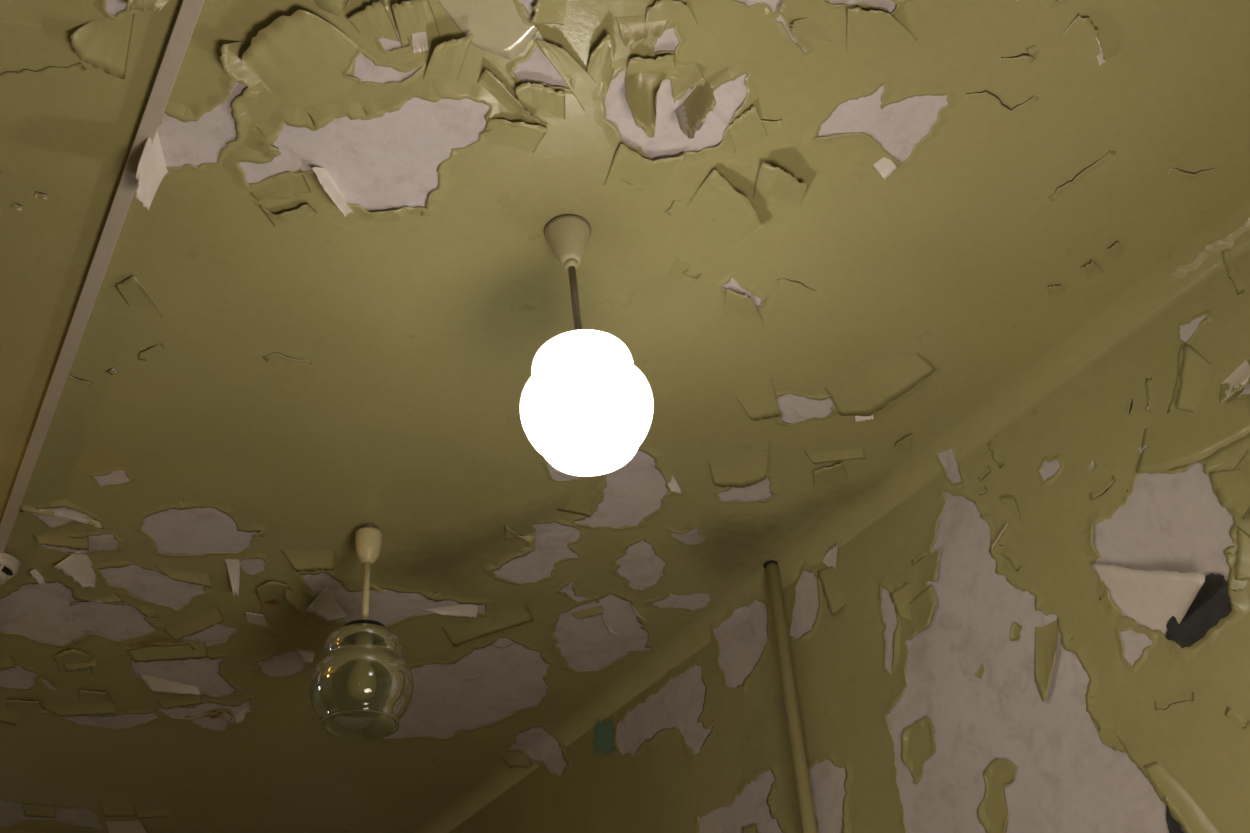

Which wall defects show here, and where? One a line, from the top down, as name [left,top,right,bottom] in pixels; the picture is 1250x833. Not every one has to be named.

peeling [70,0,170,79]
peeling [713,0,918,57]
peeling [135,0,806,249]
peeling [801,76,958,180]
peeling [708,440,781,504]
peeling [1083,309,1250,674]
peeling [0,499,494,733]
peeling [376,443,773,780]
peeling [788,543,846,645]
peeling [877,446,1220,833]
peeling [693,759,798,833]
peeling [807,750,854,833]